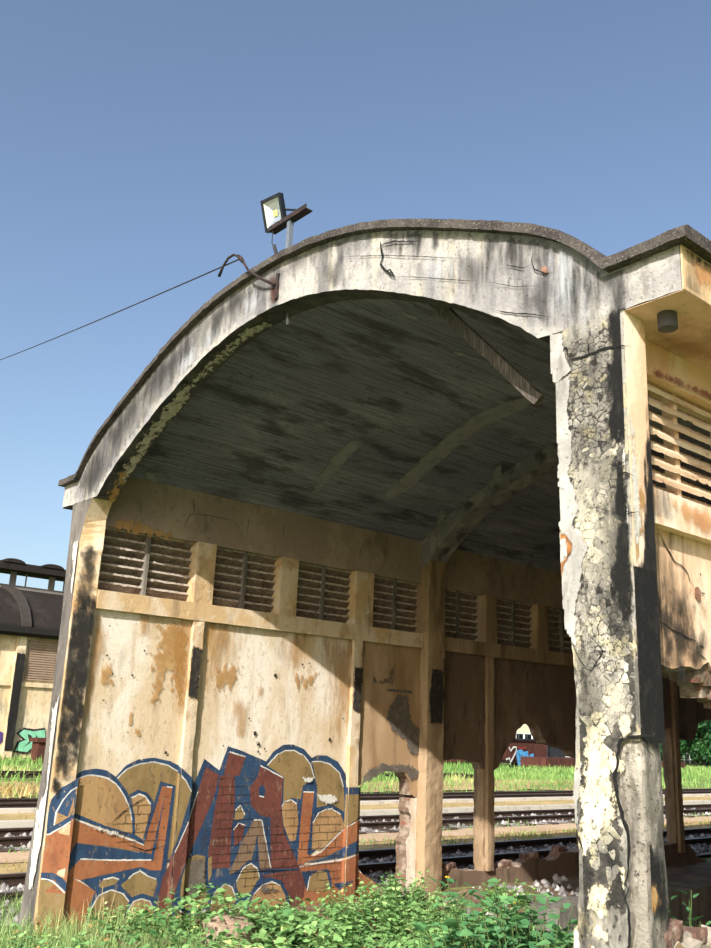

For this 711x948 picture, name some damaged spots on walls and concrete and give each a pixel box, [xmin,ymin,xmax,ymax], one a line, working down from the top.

peeling [118,322,272,486]
crack [346,240,550,287]
crack [496,309,548,317]
water stain [607,306,626,443]
water stain [52,546,96,792]
peeling [144,622,203,704]
spalling [560,534,572,574]
peeling [578,709,625,856]
crack [560,326,655,948]
peeling [618,715,631,738]
water stain [609,394,704,749]
crack [659,534,705,594]